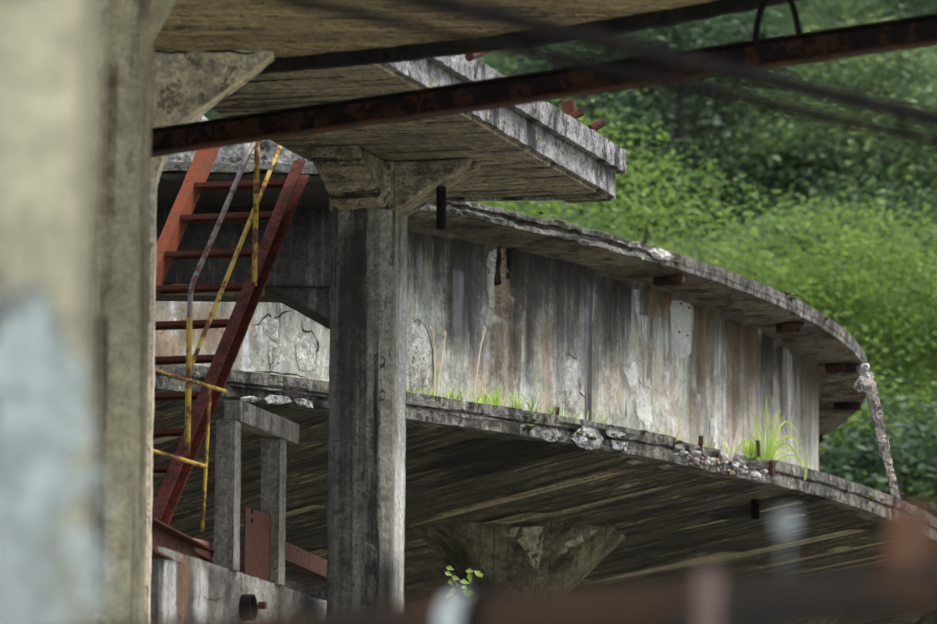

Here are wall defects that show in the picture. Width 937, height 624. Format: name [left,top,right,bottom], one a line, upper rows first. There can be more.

leakage [409,232,486,336]
leakage [510,247,646,367]
crack [252,310,329,353]
crack [255,371,308,379]
leakage [627,361,652,426]
crack [411,408,537,431]
spalling [674,448,775,482]